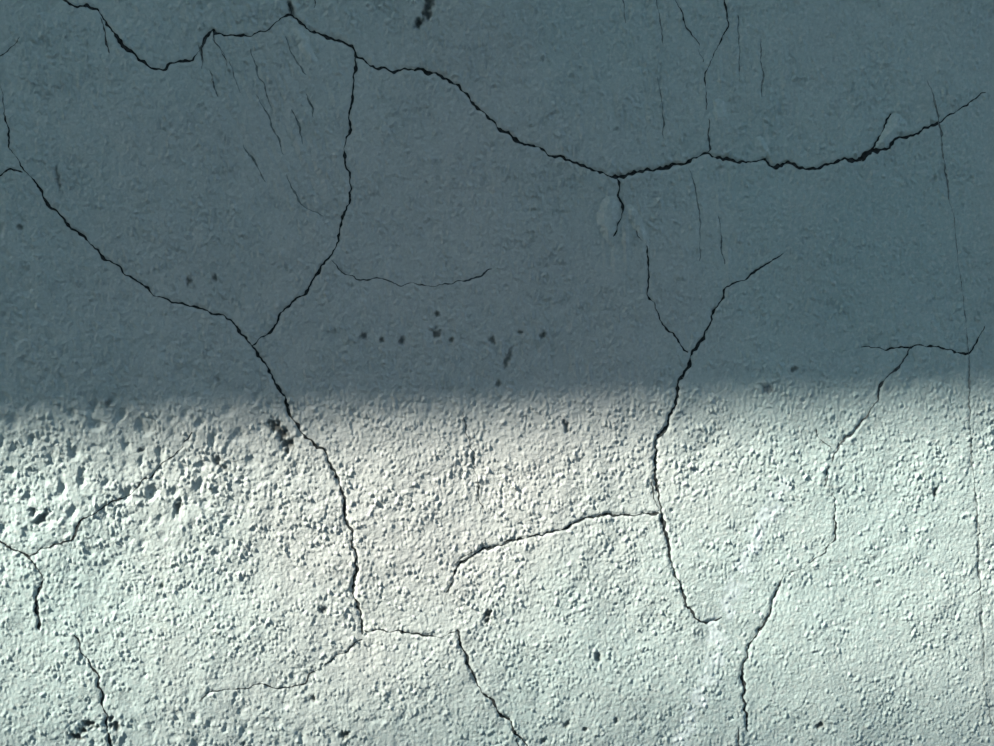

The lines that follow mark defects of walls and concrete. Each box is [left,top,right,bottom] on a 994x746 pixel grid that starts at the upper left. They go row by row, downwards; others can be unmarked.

crack [0,87,13,153]
crack [63,0,986,237]
crack [0,151,527,746]
crack [446,230,782,624]
crack [737,326,993,746]